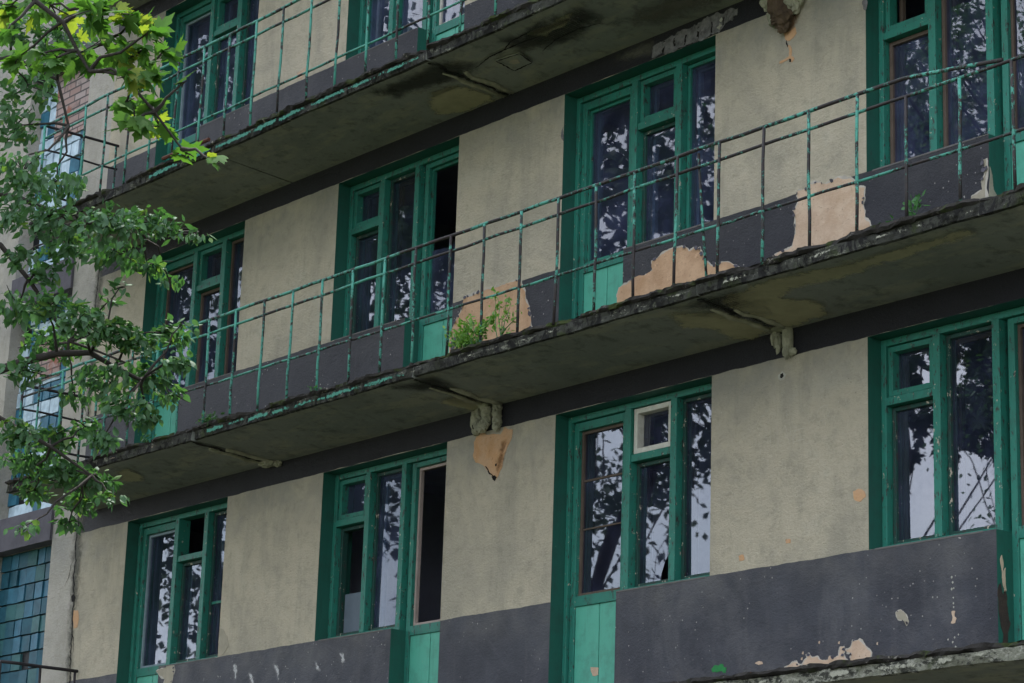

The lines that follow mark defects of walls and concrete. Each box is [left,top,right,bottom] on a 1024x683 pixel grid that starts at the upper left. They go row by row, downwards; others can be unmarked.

spalling [967,158,997,213]
flaking render [773,175,906,263]
flaking render [616,245,746,306]
flaking render [449,278,533,356]
flaking render [473,427,513,481]
crack [66,514,84,683]
spalling [895,609,909,626]
flaking render [759,638,915,683]